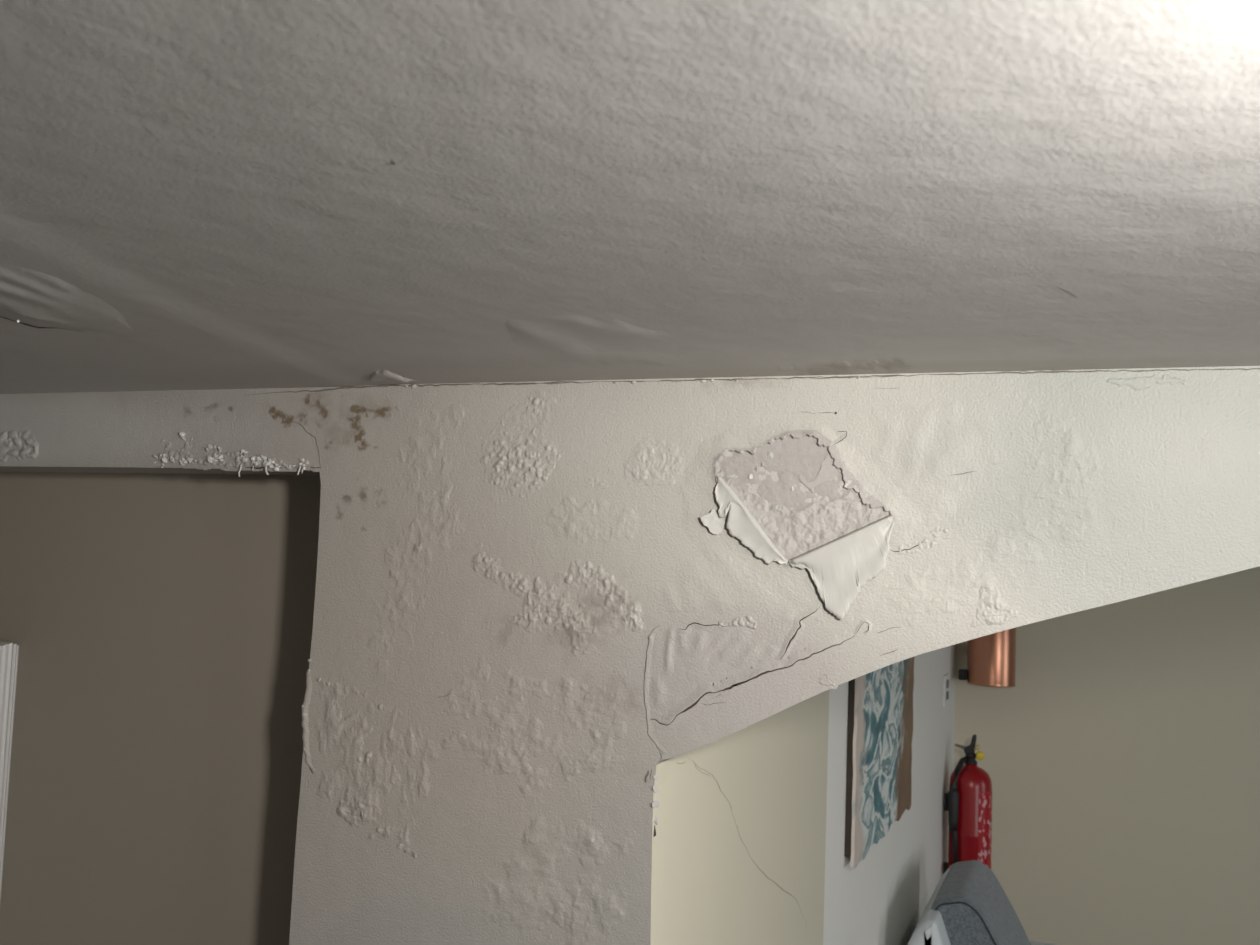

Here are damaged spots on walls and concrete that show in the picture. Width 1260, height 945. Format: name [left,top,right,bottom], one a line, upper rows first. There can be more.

corrosion [350,406,388,447]
peeling [153,432,321,477]
peeling [677,422,917,625]